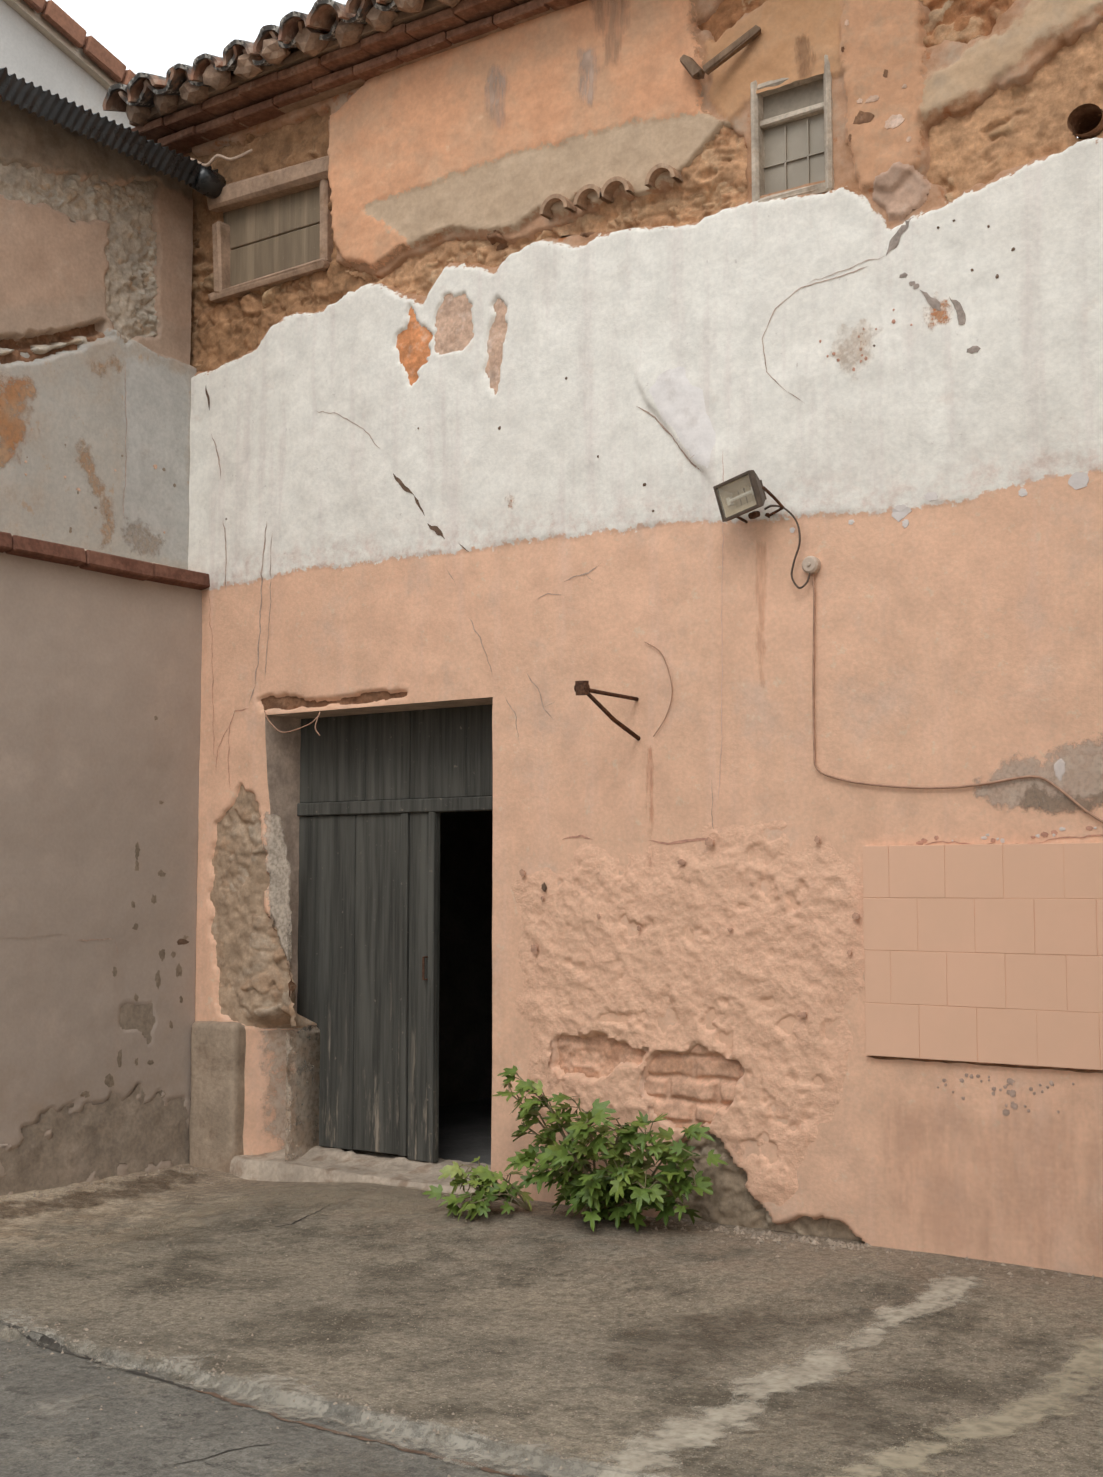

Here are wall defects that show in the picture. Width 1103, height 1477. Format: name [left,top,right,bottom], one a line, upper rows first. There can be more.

flaking render [848,95,911,142]
spalling [1067,103,1103,139]
flaking render [345,125,748,395]
crack [205,388,221,476]
crack [209,524,273,784]
peeling [975,739,1103,839]
peeling [0,935,191,1196]
flaking render [557,1035,745,1130]